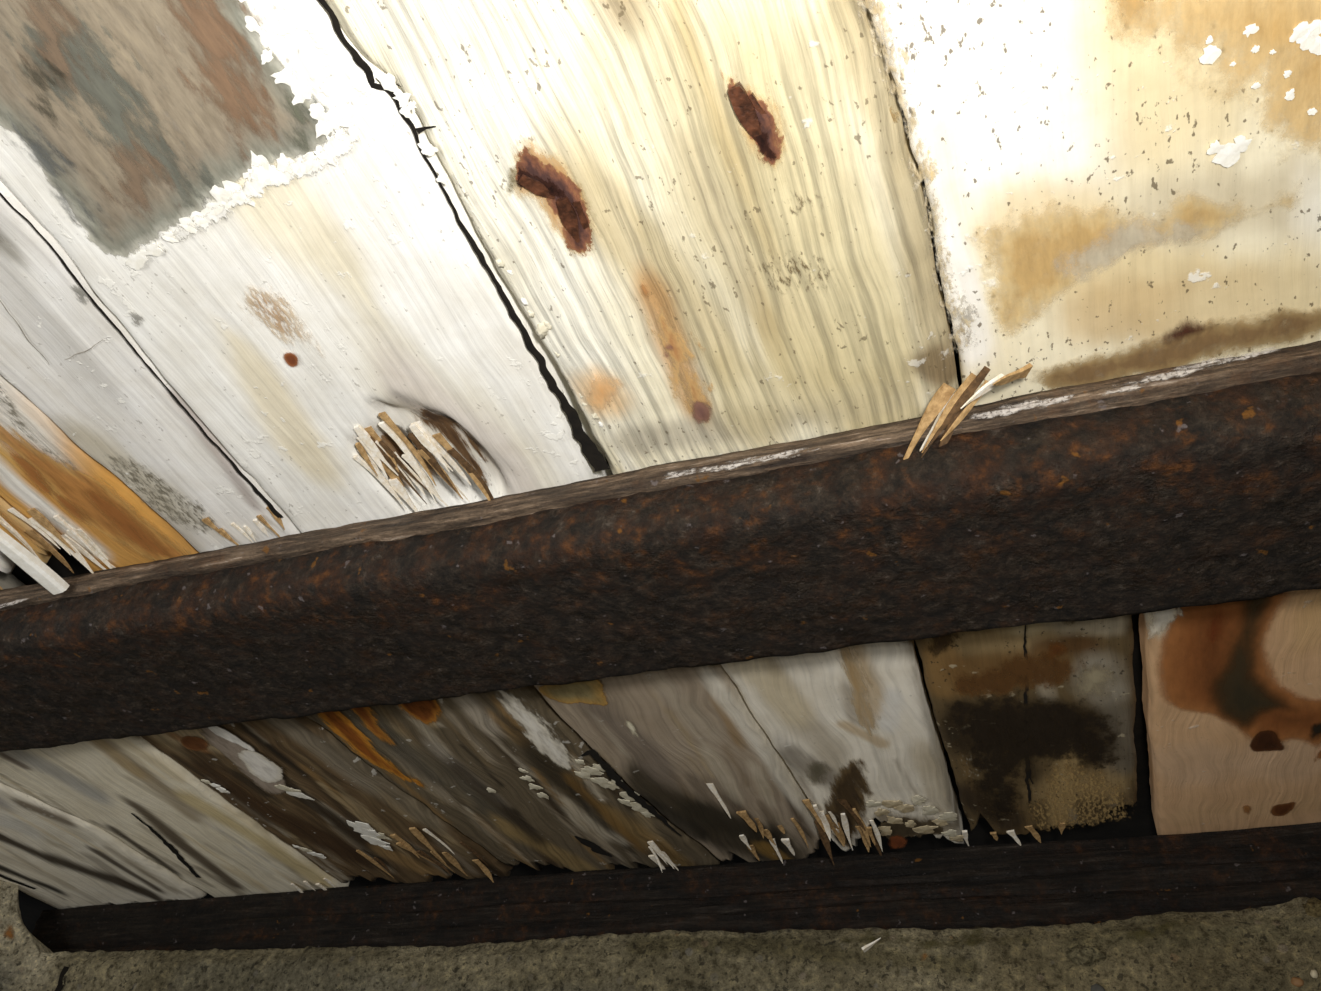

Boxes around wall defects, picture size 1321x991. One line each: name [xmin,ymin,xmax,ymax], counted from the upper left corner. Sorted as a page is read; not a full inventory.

peeling [0,0,359,270]
corrosion [728,78,784,165]
water stain [1120,0,1321,145]
corrosion [516,143,592,257]
water stain [986,195,1240,332]
water stain [972,394,1073,419]
corrosion [1041,310,1321,389]
corrosion [0,426,191,561]
water stain [666,449,818,479]
water stain [1148,593,1321,758]
corrosion [318,707,424,787]
crack [55,966,69,991]